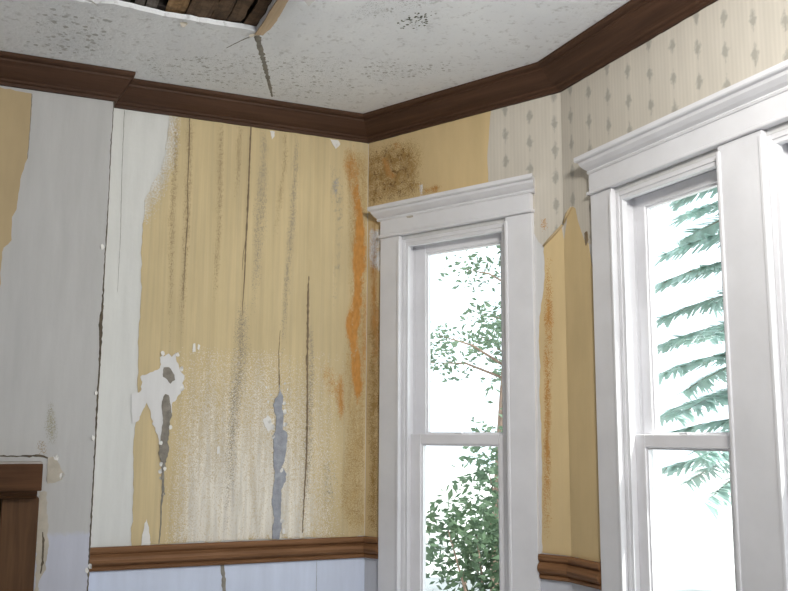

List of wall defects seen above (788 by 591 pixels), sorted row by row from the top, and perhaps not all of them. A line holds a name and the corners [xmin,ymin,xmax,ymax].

flaking render [121,0,288,37]
damp [164,121,442,543]
peeling [131,351,185,474]
flaking render [263,383,288,539]
crack [219,565,227,591]